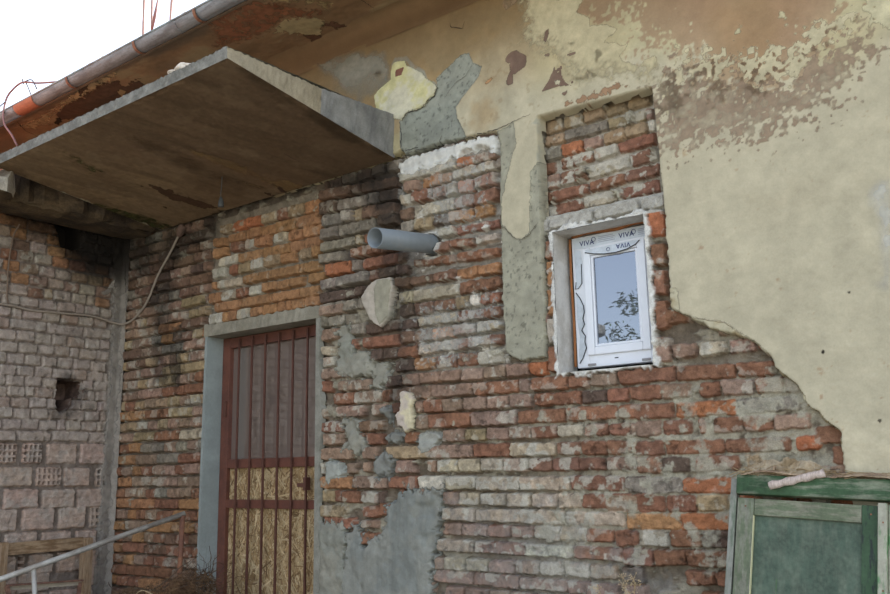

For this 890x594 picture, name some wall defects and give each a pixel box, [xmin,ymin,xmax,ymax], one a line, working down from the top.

spalling [16,71,144,129]
spalling [374,53,492,156]
peeling [506,50,526,85]
peeling [520,0,890,165]
spalling [497,122,551,362]
spalling [670,288,770,356]